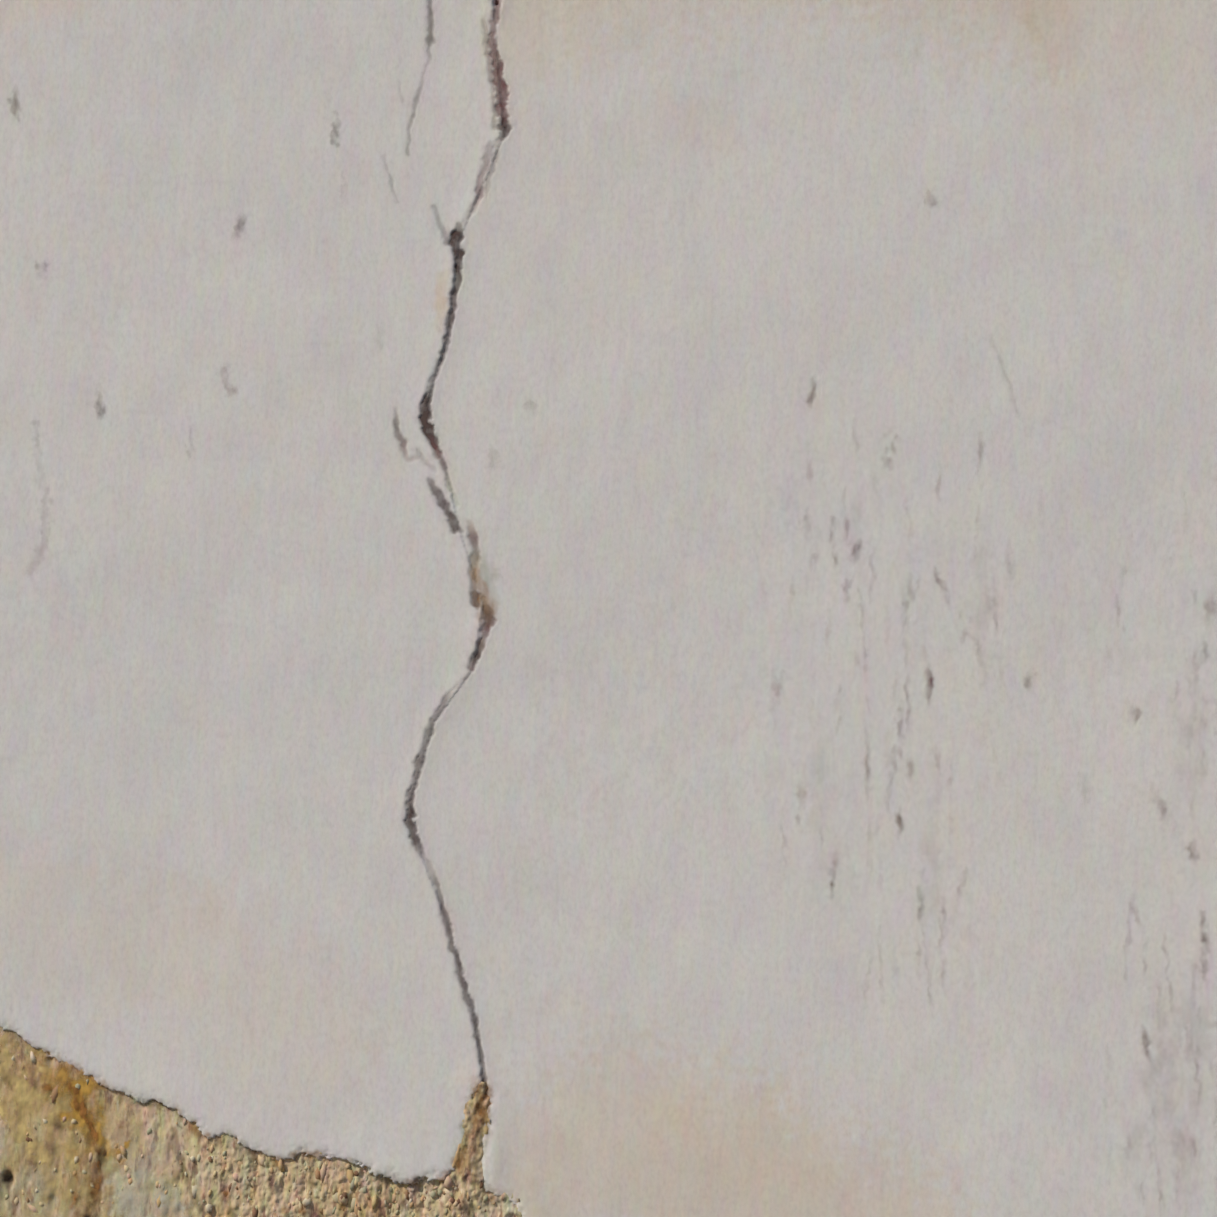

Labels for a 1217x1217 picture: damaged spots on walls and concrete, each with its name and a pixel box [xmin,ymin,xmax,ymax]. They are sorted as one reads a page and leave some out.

crack [490,0,511,138]
crack [444,230,465,340]
crack [419,393,441,458]
crack [434,491,477,541]
crack [472,593,492,664]
crack [405,797,419,845]
crack [441,904,487,1093]
spalling [0,1027,522,1217]